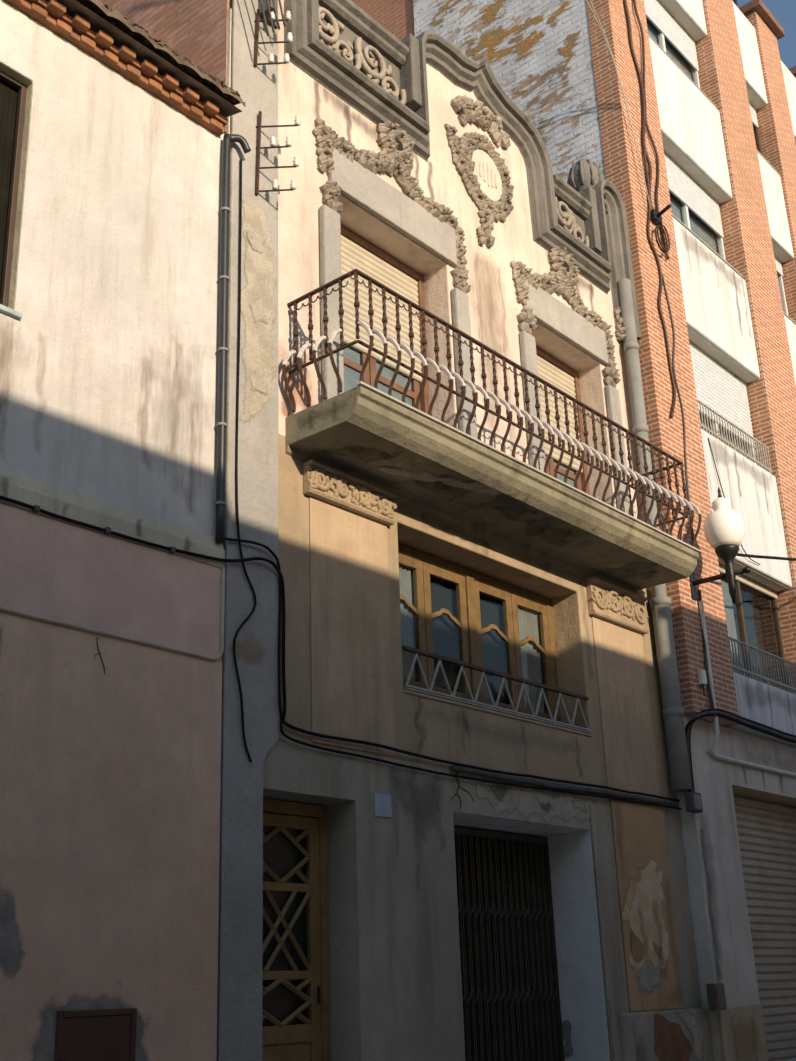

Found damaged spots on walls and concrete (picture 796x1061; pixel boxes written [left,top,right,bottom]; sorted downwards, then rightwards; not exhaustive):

peeling [428,0,459,27]
peeling [465,0,570,64]
peeling [512,30,581,141]
crack [450,771,474,811]
flaking render [622,859,670,993]
flaking render [654,1010,703,1061]